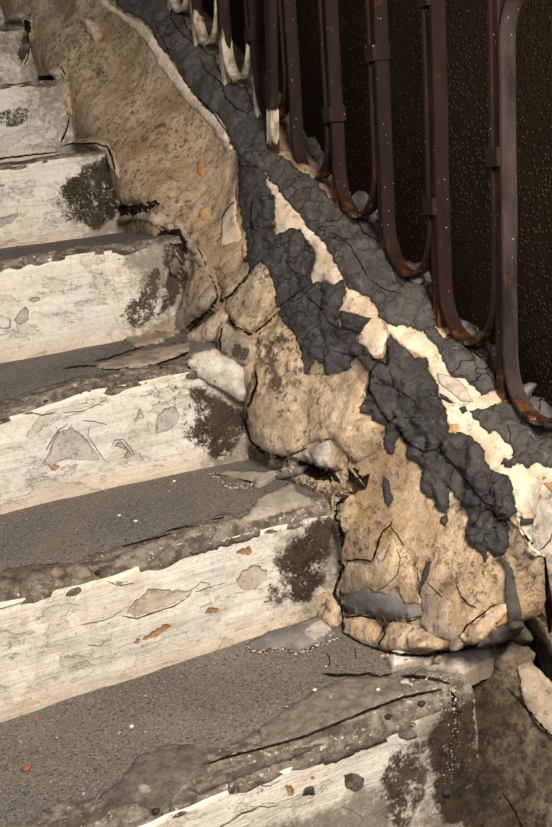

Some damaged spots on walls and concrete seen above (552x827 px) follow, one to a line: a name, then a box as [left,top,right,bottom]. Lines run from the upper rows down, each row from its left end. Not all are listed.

peeling [98,0,233,153]
mould [57,154,117,230]
mould [119,245,189,329]
peeling [63,341,190,397]
mould [150,385,246,460]
peeling [265,173,552,565]
peeling [190,437,335,555]
mould [264,516,335,609]
crack [203,370,497,765]
peeling [248,615,334,650]
spalling [100,676,413,814]
damp [282,696,508,827]